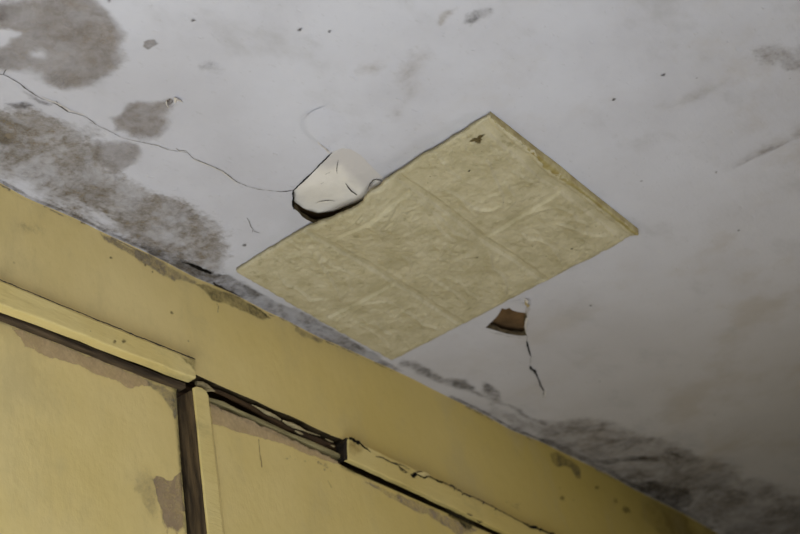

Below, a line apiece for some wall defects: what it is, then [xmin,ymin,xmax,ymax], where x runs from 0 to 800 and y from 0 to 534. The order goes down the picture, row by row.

leakage [15,0,117,86]
crack [0,69,275,192]
spalling [276,148,384,223]
peeling [14,330,177,418]
crack [526,336,544,396]
peeling [154,473,185,531]
crack [349,437,555,534]